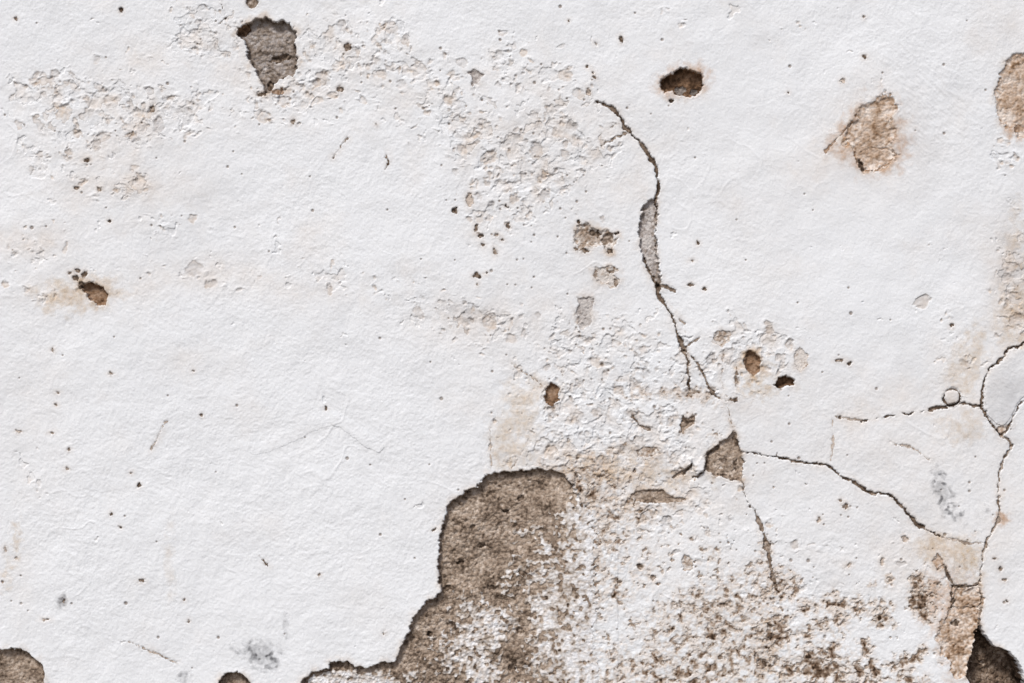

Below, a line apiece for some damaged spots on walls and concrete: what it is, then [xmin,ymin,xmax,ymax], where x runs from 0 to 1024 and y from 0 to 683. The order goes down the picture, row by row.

spalling [172,0,365,96]
peeling [824,91,898,174]
peeling [994,53,1024,138]
crack [596,101,732,424]
crack [631,415,651,431]
crack [672,463,705,479]
spalling [678,431,745,481]
crack [747,342,1024,625]
spalling [301,439,985,683]
crack [740,477,778,588]
spalling [0,648,45,683]
spalling [219,671,250,683]